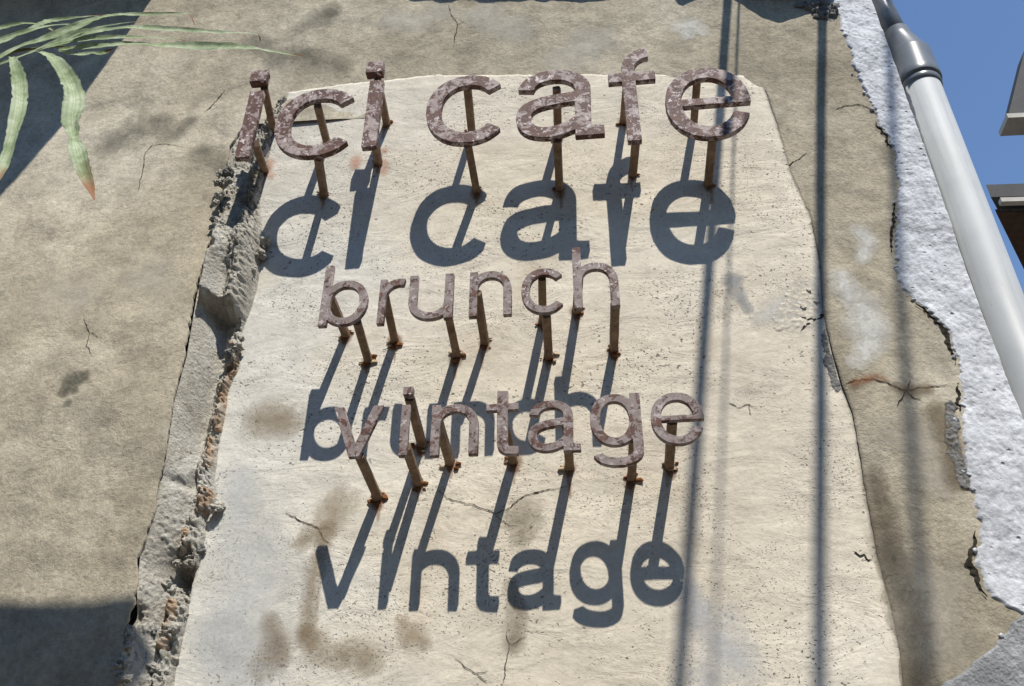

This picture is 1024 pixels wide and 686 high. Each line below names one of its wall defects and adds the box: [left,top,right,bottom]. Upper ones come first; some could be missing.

flaking render [794,0,1024,686]
leakage [61,373,87,394]
spalling [109,95,288,686]
crack [846,378,950,406]
crack [439,481,576,526]
crack [286,513,329,543]
crack [456,631,524,685]